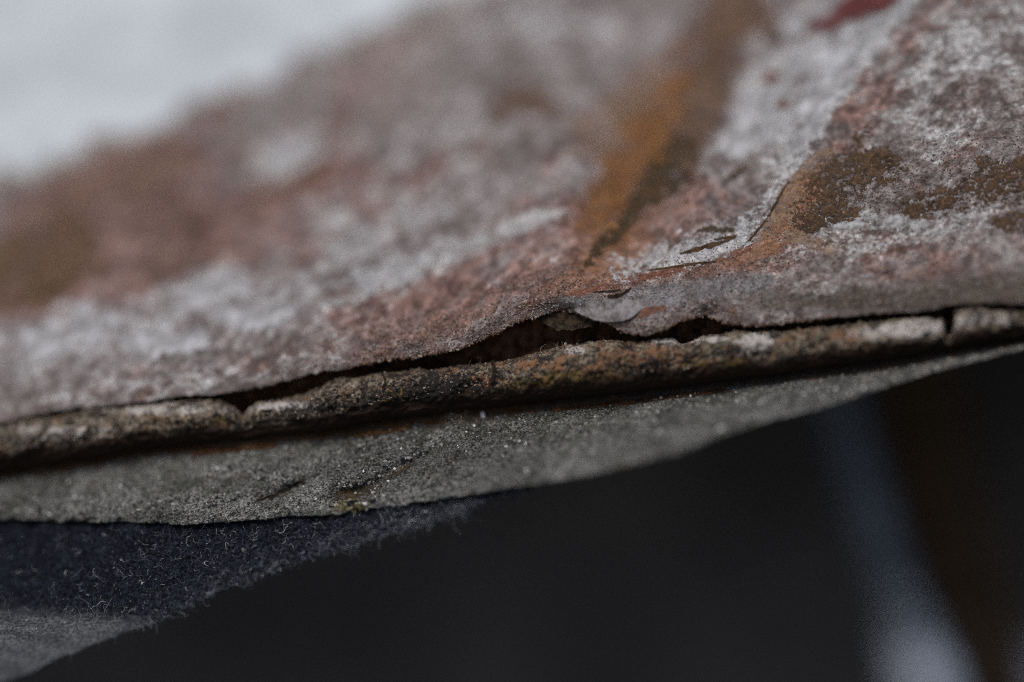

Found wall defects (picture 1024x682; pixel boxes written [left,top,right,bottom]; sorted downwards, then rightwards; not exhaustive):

rust [566,147,839,297]
peeling [572,298,644,323]
rust [549,388,726,412]
rust [189,443,277,456]